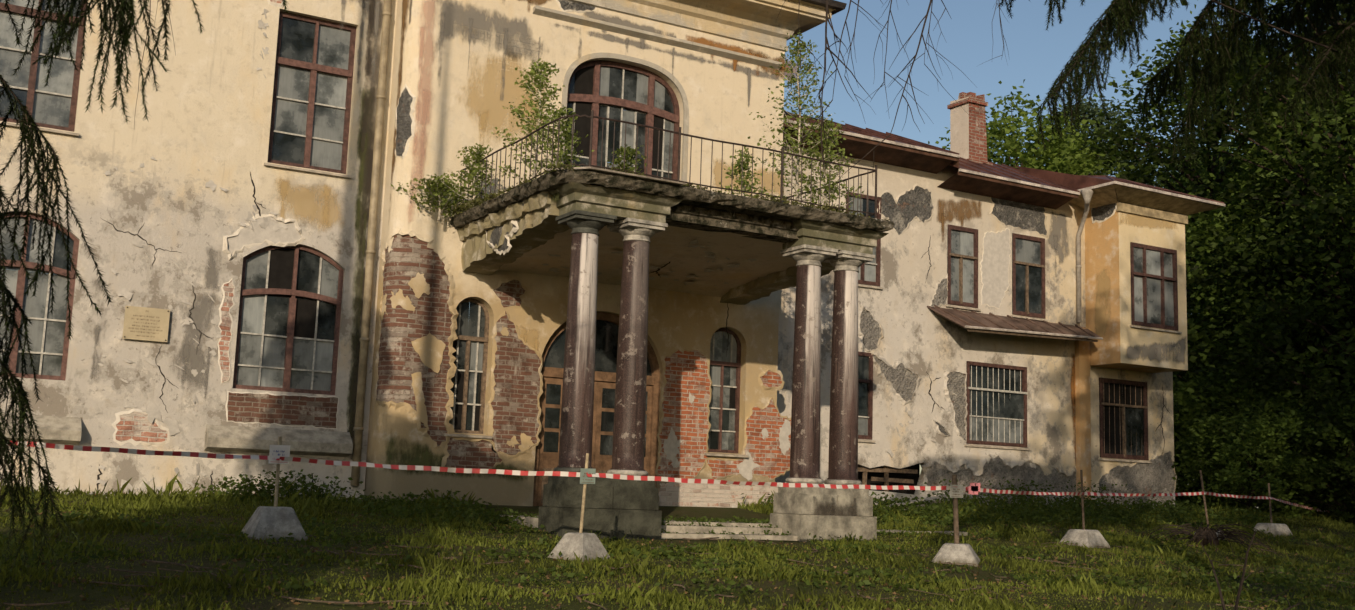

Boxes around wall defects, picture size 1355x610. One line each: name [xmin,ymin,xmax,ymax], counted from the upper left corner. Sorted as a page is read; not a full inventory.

water stain [397,0,412,105]
water stain [438,0,547,136]
crack [100,217,181,265]
flaking render [222,204,306,260]
water stain [281,182,338,226]
water stain [342,0,383,459]
flaking render [877,184,934,236]
crack [155,346,179,413]
crack [189,285,212,355]
flaking render [374,229,543,474]
flaking render [655,348,791,508]
flaking render [858,305,1077,506]